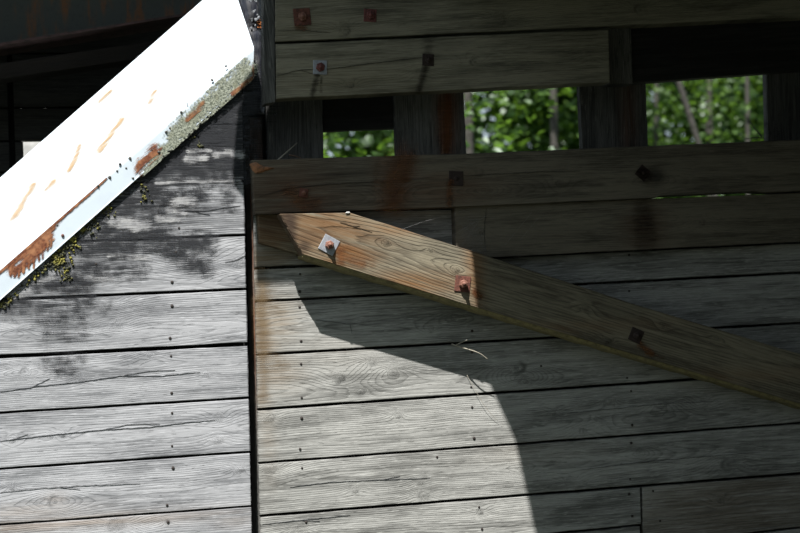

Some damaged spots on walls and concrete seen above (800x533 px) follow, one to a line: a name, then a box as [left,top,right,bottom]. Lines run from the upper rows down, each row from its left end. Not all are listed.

corrosion [134,143,162,175]
leakage [0,63,278,341]
corrosion [0,177,107,278]
leakage [41,351,85,377]
crack [3,420,211,441]